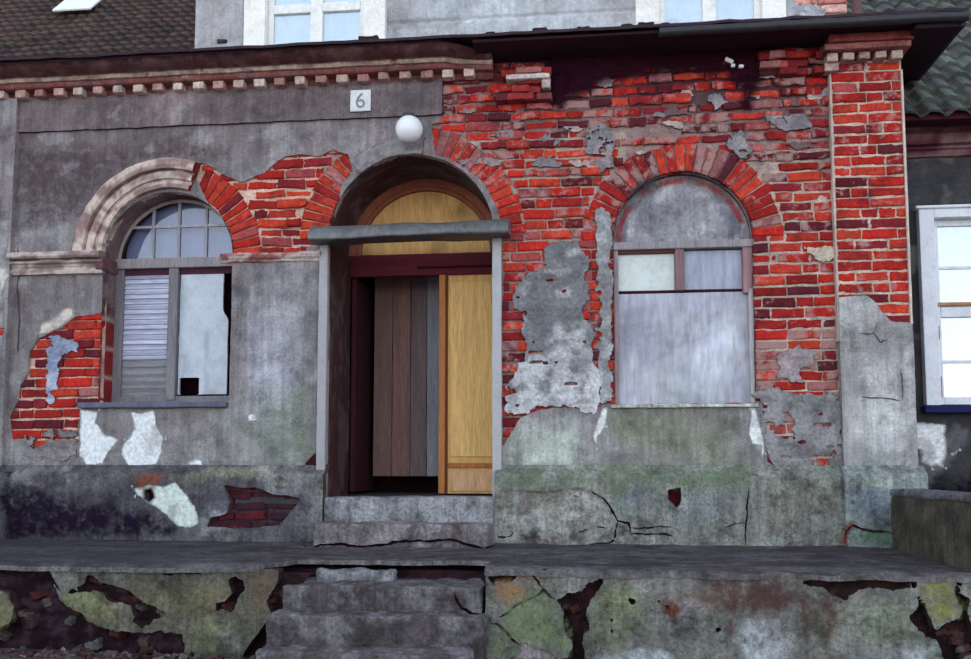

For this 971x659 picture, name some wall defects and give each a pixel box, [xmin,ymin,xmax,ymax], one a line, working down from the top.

peeling [195,148,360,253]
peeling [0,268,8,294]
peeling [429,46,913,465]
peeling [9,308,167,465]
peeling [917,423,962,471]
peeling [131,483,297,529]
crack [568,490,673,545]
crack [842,524,892,544]
spalling [0,570,185,655]
spalling [215,576,245,612]
spalling [511,579,603,659]
spalling [803,580,971,659]